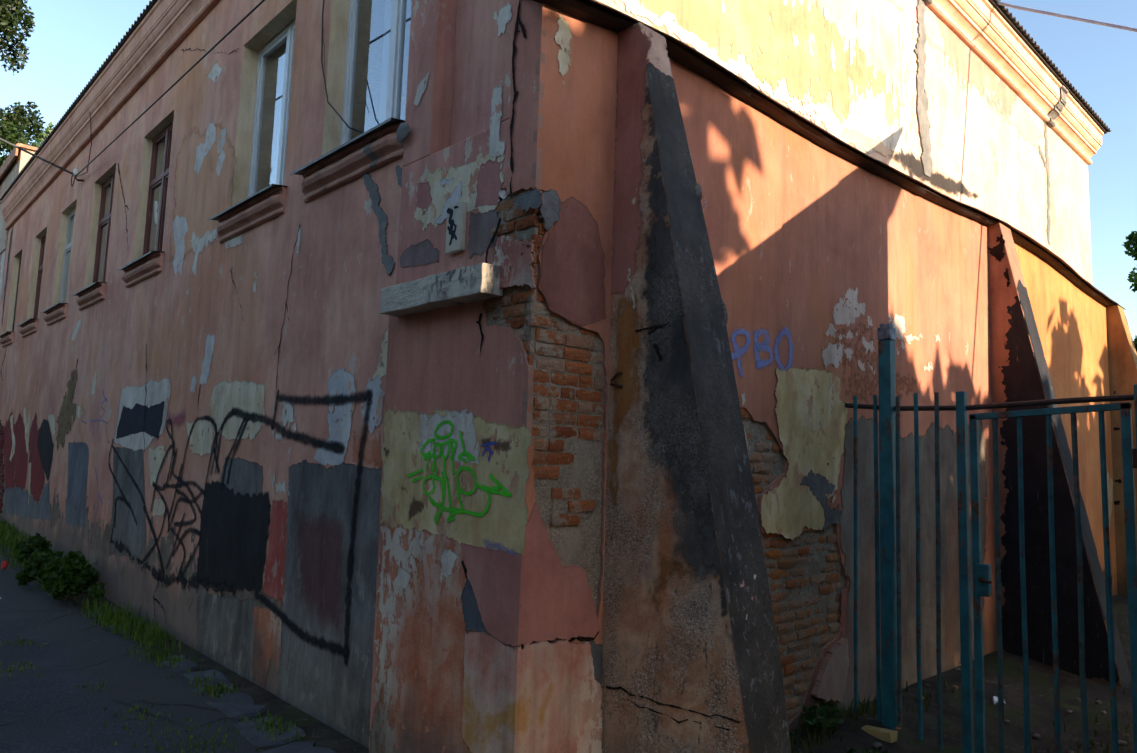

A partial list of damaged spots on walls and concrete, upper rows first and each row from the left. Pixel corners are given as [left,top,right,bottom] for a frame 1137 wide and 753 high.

peeling [170,122,243,276]
crack [485,0,526,263]
crack [275,225,300,394]
peeling [314,0,1042,753]
crack [467,631,599,649]
crack [606,686,740,731]